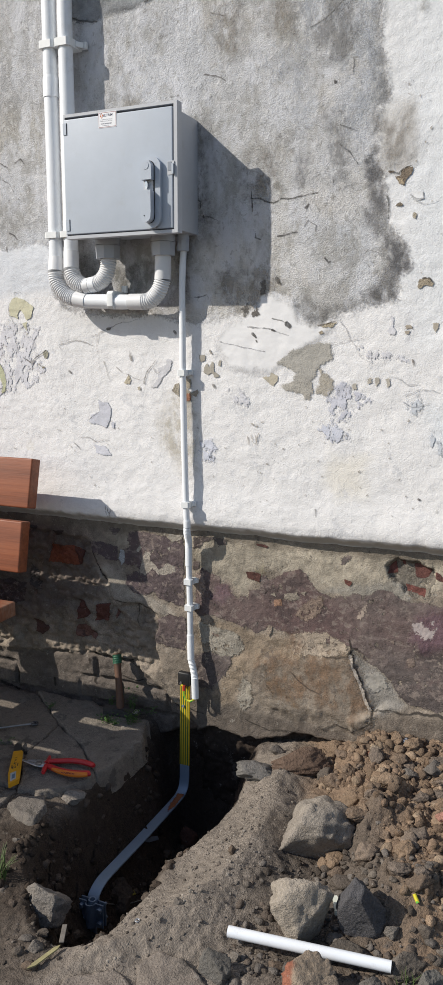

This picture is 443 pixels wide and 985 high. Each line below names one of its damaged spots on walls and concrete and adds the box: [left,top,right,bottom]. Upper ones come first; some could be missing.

peeling [0,0,49,251]
peeling [0,292,48,395]
peeling [55,0,434,455]
leakage [222,268,281,317]
leakage [366,192,409,300]
peeling [0,563,43,603]
peeling [49,527,443,714]
crack [321,640,443,733]